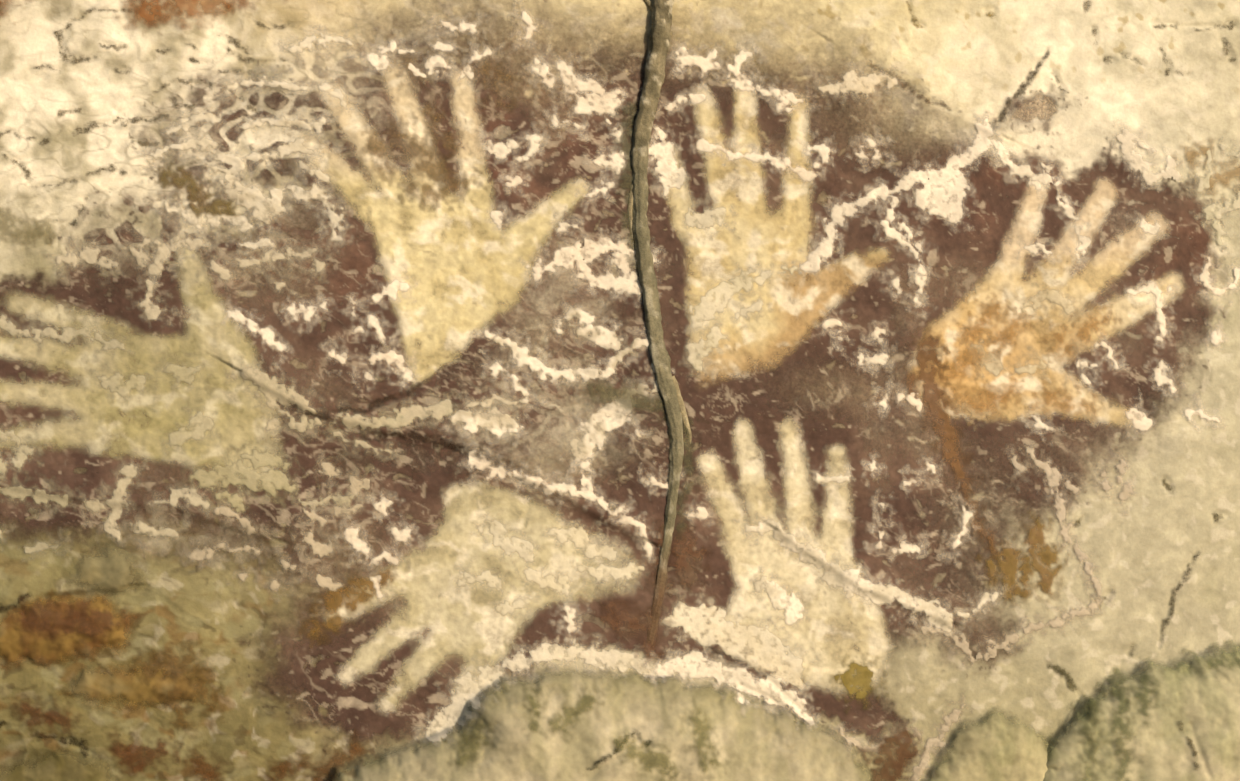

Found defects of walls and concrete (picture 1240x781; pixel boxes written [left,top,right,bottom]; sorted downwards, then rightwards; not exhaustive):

crack [989,51,1063,128]
leakage [0,15,670,750]
leakage [646,46,1226,744]
crack [1162,555,1199,632]
leakage [615,739,676,778]
leakage [691,717,716,771]